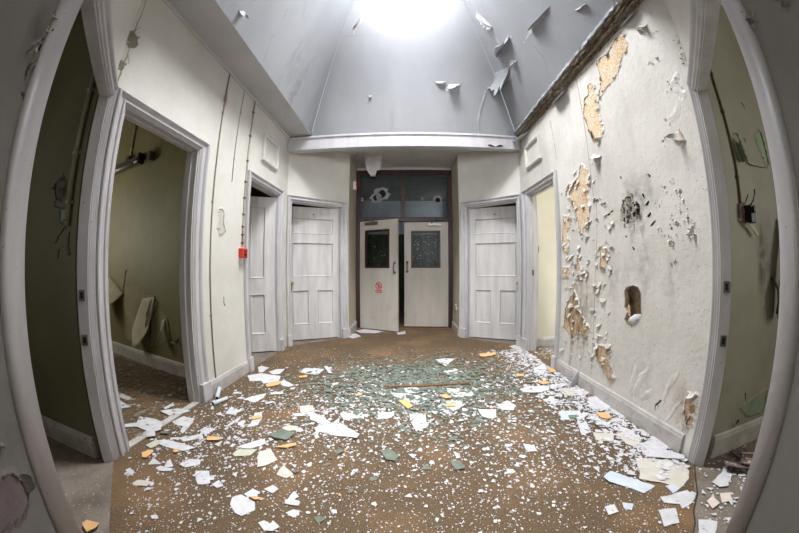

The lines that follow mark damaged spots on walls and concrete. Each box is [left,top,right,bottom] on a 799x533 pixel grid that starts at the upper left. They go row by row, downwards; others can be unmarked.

flaking render [126,31,140,48]
peeling [476,11,512,59]
peeling [523,6,549,43]
peeling [435,81,460,92]
peeling [487,60,518,96]
peeling [731,132,748,166]
peeling [753,128,769,170]
peeling [559,10,697,384]
peeling [125,285,170,347]
peeling [682,390,701,430]
peeling [534,363,695,504]
peeling [0,465,36,533]